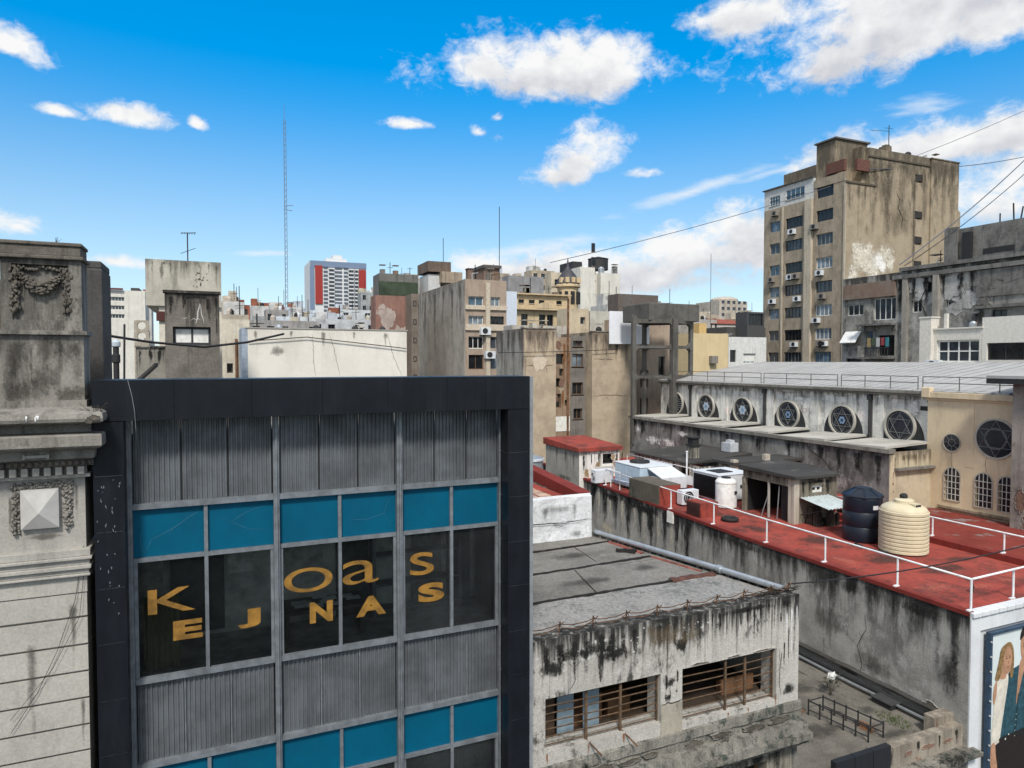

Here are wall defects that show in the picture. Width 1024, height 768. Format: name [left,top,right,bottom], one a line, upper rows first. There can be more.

spalling [843,243,1021,316]
damp [169,294,218,333]
peeling [376,303,405,330]
damp [592,485,761,566]
damp [830,573,877,610]
damp [533,628,641,682]
damp [657,623,687,654]
damp [705,600,795,661]
damp [892,596,960,692]